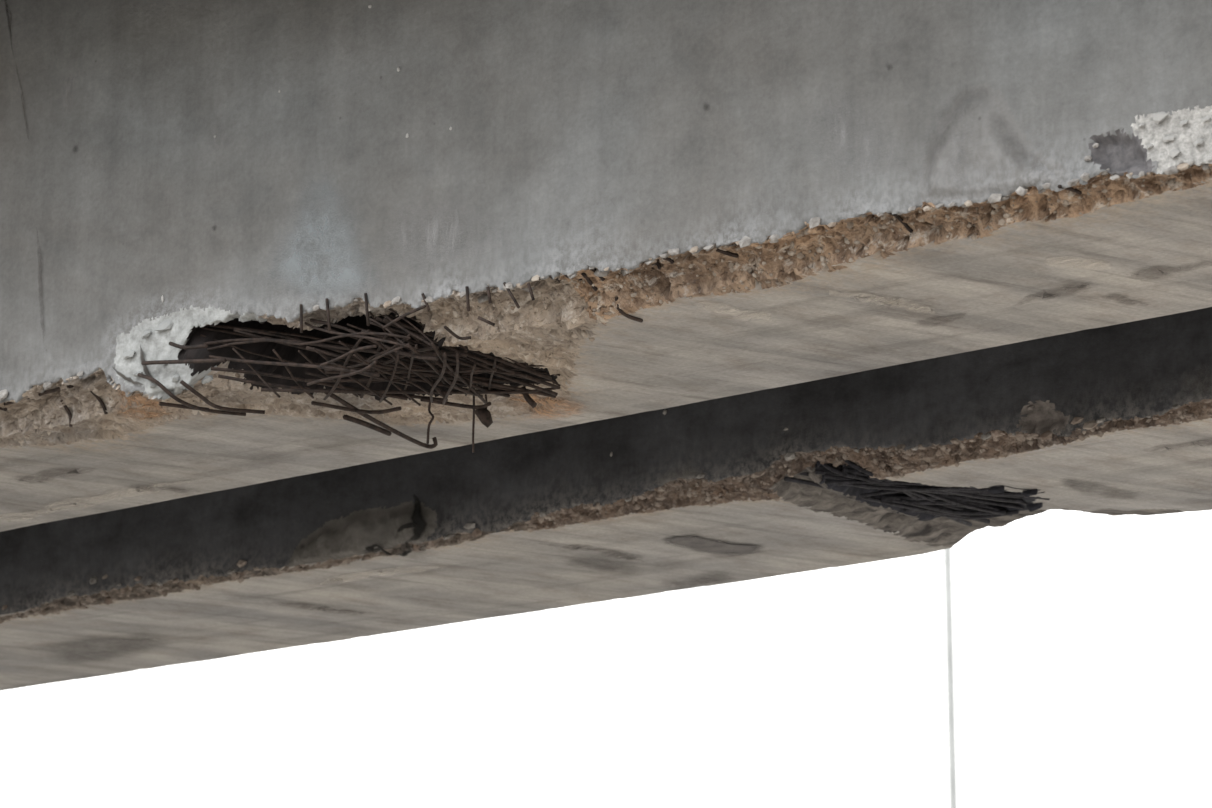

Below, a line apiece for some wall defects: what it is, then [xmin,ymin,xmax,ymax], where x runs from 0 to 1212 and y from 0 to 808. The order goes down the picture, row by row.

spalling [0,105,1212,449]
spalling [0,399,1212,624]